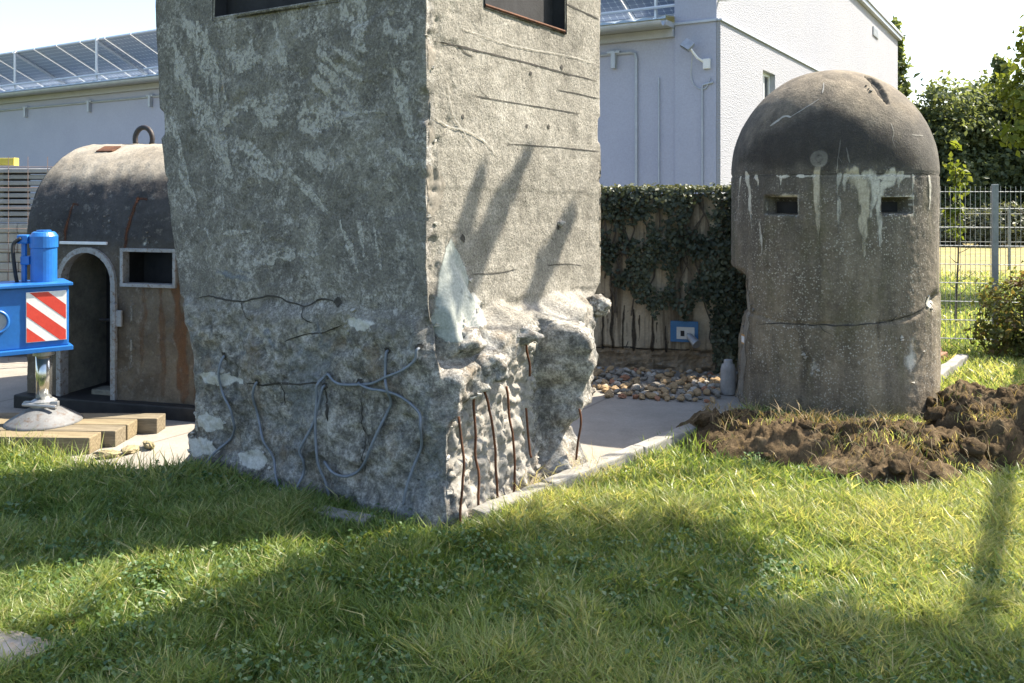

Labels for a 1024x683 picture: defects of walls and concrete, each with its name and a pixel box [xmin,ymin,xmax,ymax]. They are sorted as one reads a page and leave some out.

damp [738,171,762,246]
damp [756,112,915,257]
crack [199,295,342,342]
spalling [430,240,487,345]
crack [758,305,926,334]
spalling [446,341,544,521]